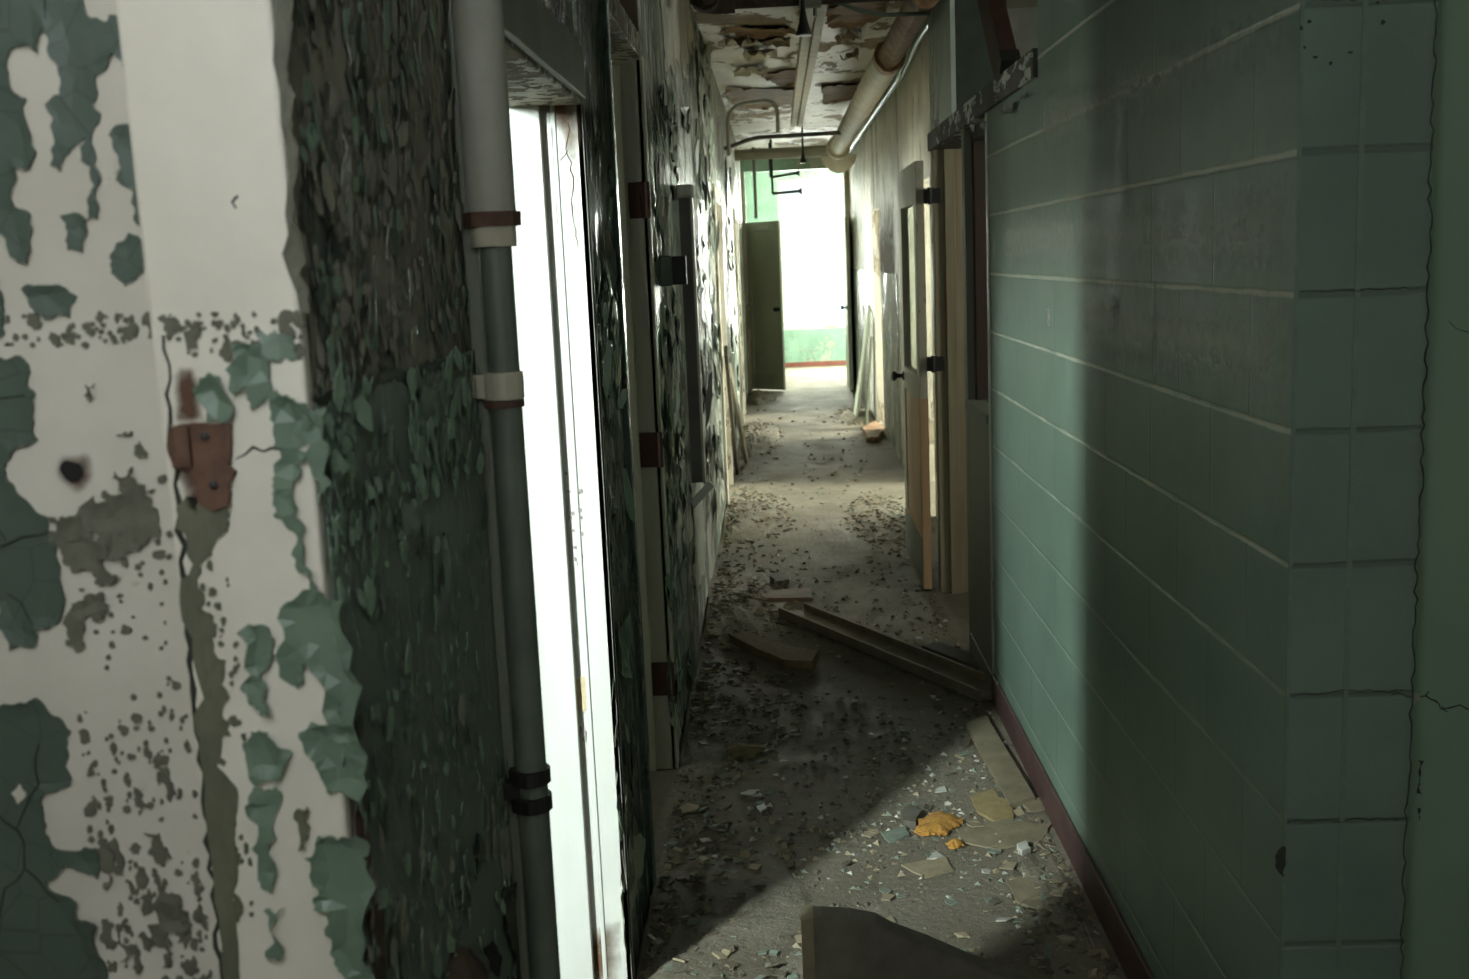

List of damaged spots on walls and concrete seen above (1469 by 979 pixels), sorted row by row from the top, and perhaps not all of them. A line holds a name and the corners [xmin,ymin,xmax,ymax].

rust [178,371,199,420]
peeling [0,0,521,979]
peeling [649,0,796,735]
peeling [821,84,858,105]
peeling [825,1,887,62]
crack [1287,0,1469,979]